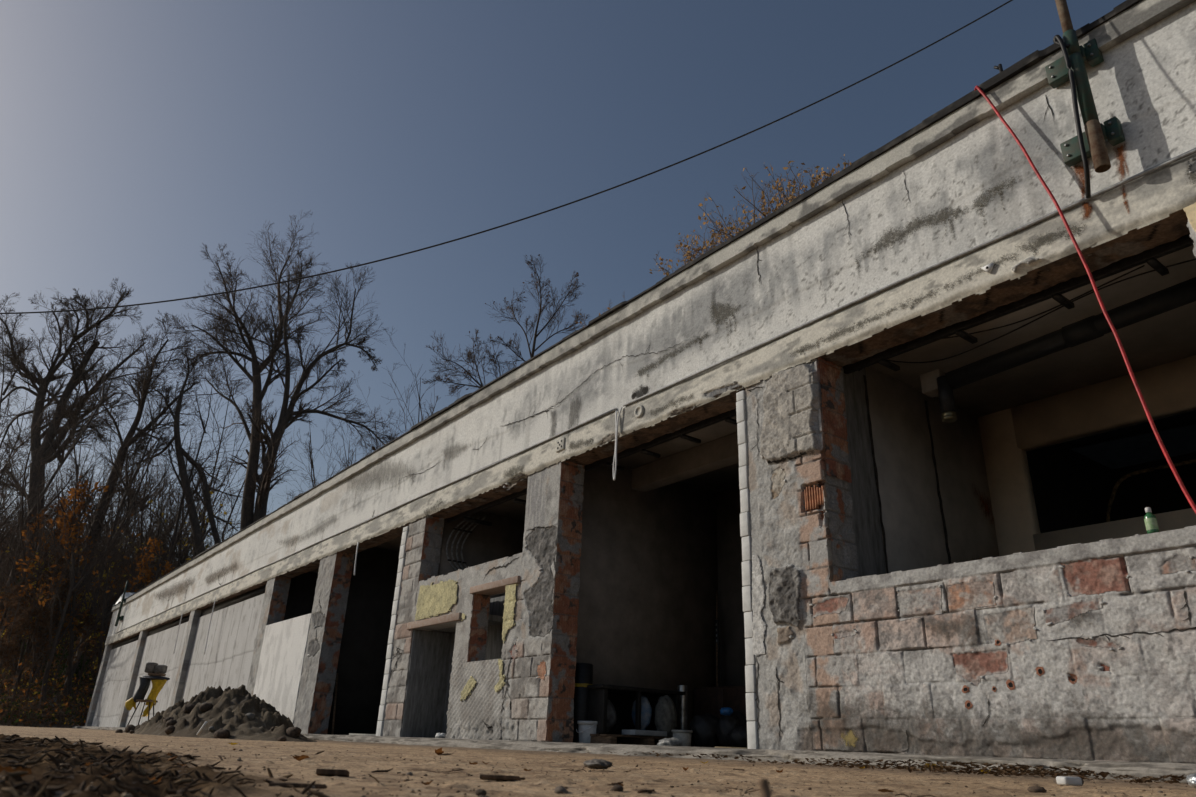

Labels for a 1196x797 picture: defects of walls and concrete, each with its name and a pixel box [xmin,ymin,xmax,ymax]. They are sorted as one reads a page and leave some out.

corrosion [1072,165,1092,219]
corrosion [1114,144,1129,212]
flaking render [802,480,825,528]
spalling [502,527,557,643]
spalling [751,555,803,656]
crack [1046,591,1196,641]